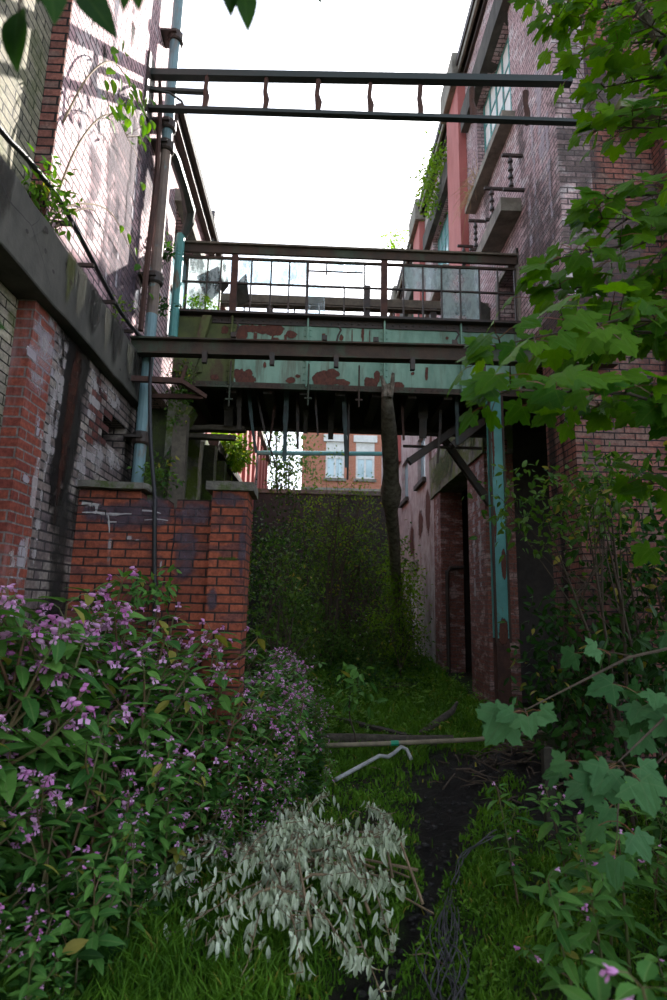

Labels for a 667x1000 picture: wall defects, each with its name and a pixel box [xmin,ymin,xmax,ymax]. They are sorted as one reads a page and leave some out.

leakage [23,316,67,540]
spalling [85,377,112,450]
leakage [88,369,119,417]
leakage [72,420,132,534]
leakage [10,540,34,578]